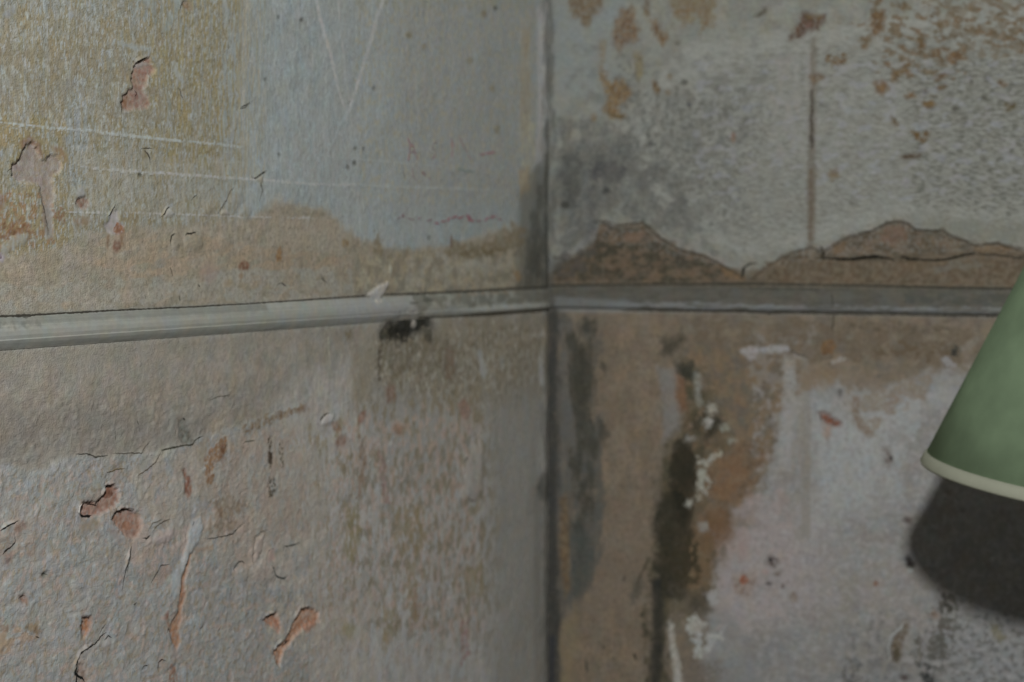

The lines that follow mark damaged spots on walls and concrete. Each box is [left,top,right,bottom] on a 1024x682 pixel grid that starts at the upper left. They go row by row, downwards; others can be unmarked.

flaking render [120,54,156,114]
peeling [784,0,1024,113]
peeling [889,113,932,162]
flaking render [8,134,69,241]
flaking render [550,216,1024,290]
water stain [374,284,461,407]
crack [78,436,202,474]
flaking render [78,481,145,546]
water stain [534,308,614,682]
water stain [636,312,982,682]
flaking render [261,603,320,669]